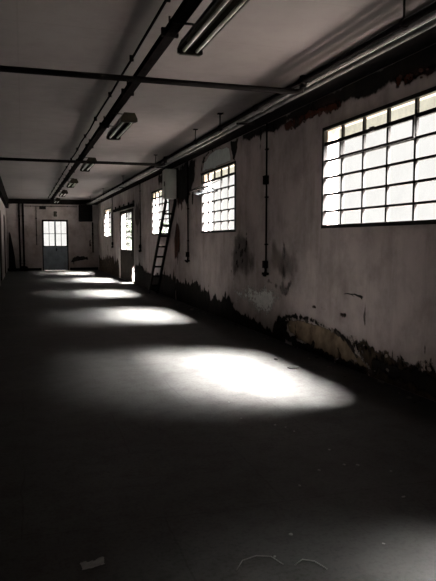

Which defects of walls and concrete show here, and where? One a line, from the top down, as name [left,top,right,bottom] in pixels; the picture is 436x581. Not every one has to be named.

peeling [395,64,436,88]
peeling [284,100,341,131]
water stain [233,233,253,274]
water stain [134,245,293,342]
spalling [278,313,373,374]